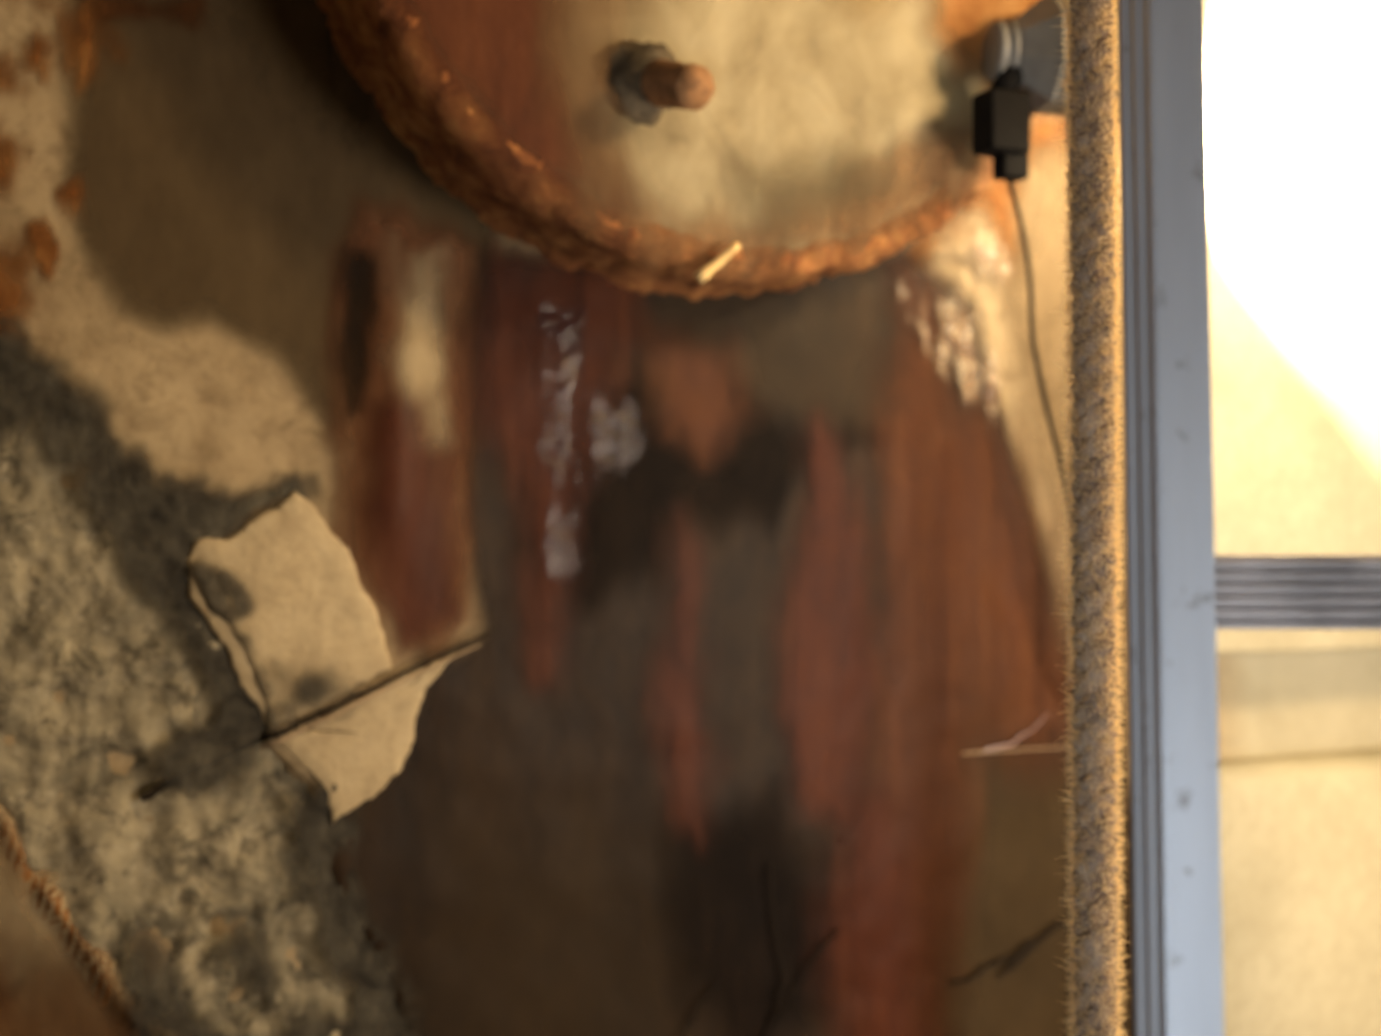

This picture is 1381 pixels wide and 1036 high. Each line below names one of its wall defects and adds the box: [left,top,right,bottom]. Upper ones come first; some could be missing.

rust [0,34,50,90]
rust [0,138,15,191]
rust [317,0,1022,301]
rust [1029,110,1070,165]
rust [0,220,59,326]
rust [334,206,472,651]
damp [70,0,1077,1036]
spalling [0,322,454,1036]
crack [257,632,489,749]
crack [139,781,169,802]
damp [1115,750,1134,1036]